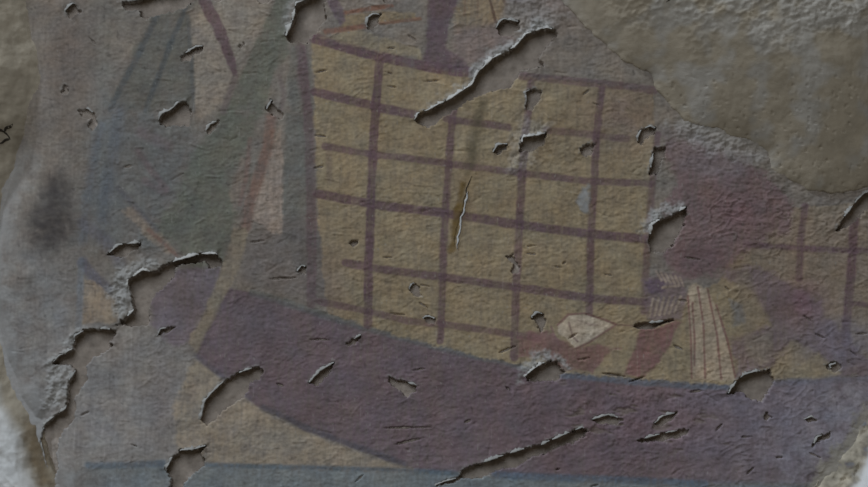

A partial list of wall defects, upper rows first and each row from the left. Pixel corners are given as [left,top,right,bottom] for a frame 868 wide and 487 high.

flaking render [285,0,329,43]
flaking render [365,13,382,30]
flaking render [496,17,519,37]
flaking render [158,101,192,127]
flaking render [648,206,686,252]
flaking render [836,190,868,231]
flaking render [40,251,222,472]
flaking render [198,367,264,425]
flaking render [523,362,564,382]
flaking render [727,369,772,401]
flaking render [164,445,205,487]